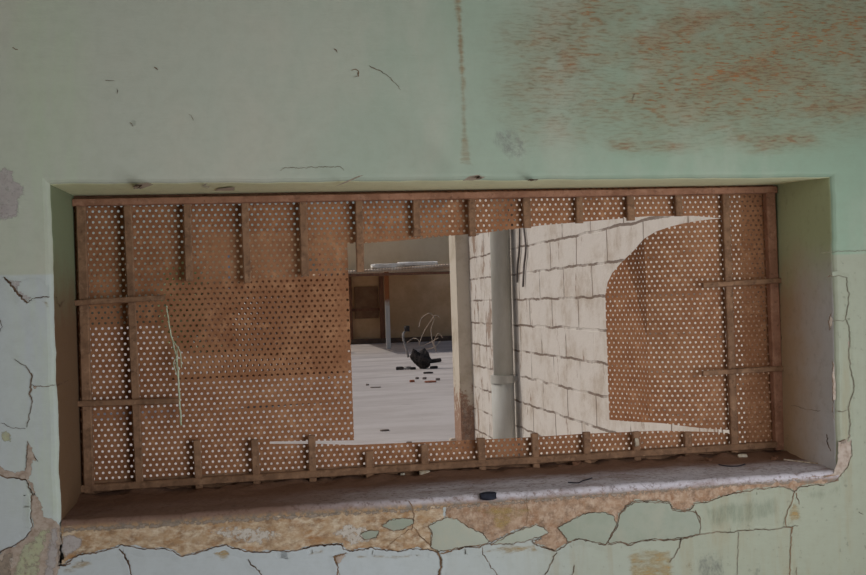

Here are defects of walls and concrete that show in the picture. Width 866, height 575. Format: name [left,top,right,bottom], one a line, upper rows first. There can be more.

peeling [0,168,23,219]
peeling [0,277,49,309]
crack [822,250,866,451]
crack [2,355,69,429]
peeling [0,435,853,575]
crack [116,549,132,575]
crack [243,559,262,575]
crack [327,547,352,575]
crack [387,501,497,575]
crack [545,552,575,575]
crack [608,492,800,575]